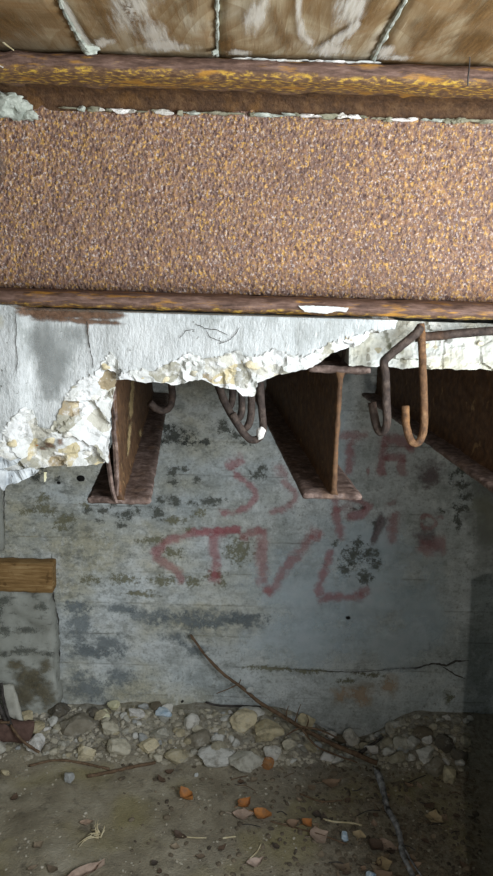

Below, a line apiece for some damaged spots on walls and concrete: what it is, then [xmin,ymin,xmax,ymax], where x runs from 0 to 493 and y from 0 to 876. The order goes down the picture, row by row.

peeling [299,305,348,314]
spalling [0,321,493,491]
corrosion [106,380,141,503]
damp [160,419,251,447]
damp [167,466,201,485]
damp [19,492,226,533]
damp [135,535,183,558]
damp [222,535,256,567]
crack [276,660,469,679]